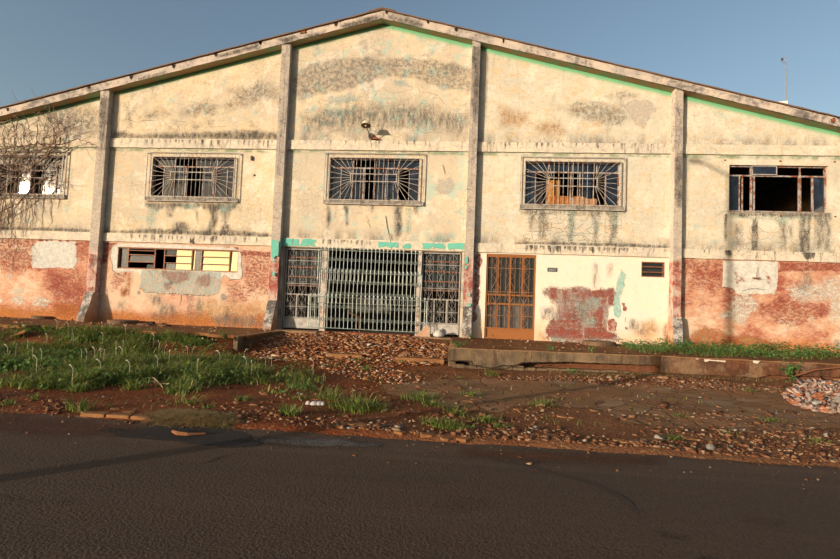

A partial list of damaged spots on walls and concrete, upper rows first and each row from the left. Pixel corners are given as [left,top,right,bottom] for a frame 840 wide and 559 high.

leakage [294,46,480,116]
leakage [304,106,463,129]
leakage [724,212,830,260]
peeling [0,238,317,307]
peeling [422,243,483,322]
peeling [543,269,627,342]
peeling [673,259,723,293]
peeling [720,261,840,347]